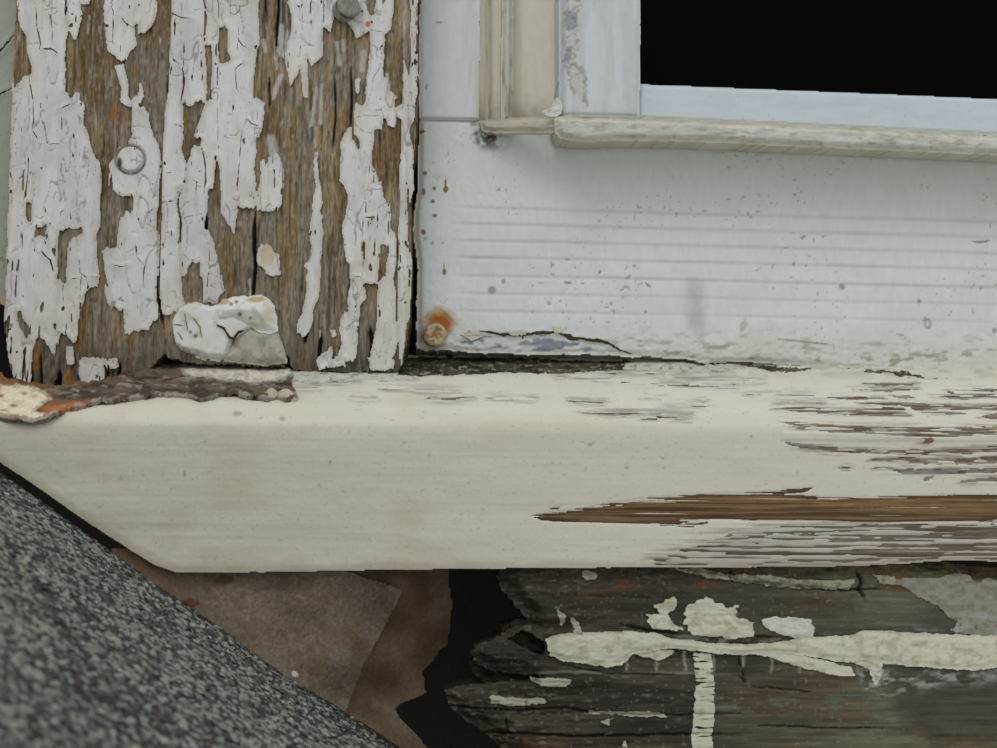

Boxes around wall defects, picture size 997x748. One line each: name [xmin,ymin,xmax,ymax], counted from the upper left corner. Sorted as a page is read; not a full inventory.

peeling [282,0,337,98]
peeling [4,0,284,383]
peeling [316,0,634,383]
peeling [297,152,324,337]
rust [424,309,454,333]
peeling [731,363,812,373]
peeling [773,366,997,483]
peeling [532,487,997,590]
peeling [646,597,815,639]
peeling [872,573,997,636]
peeling [489,676,572,706]
peeling [588,710,667,726]